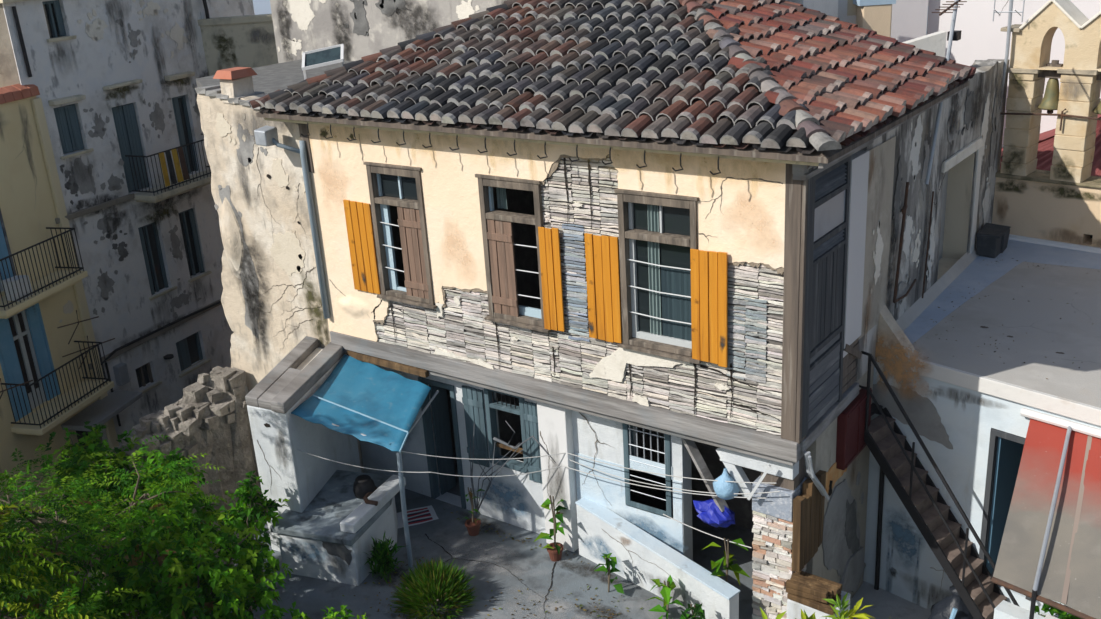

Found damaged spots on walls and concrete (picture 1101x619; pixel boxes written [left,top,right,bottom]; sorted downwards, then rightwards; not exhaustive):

flaking render [277,0,412,56]
damp [106,86,137,98]
damp [145,191,195,224]
crack [699,177,783,243]
flaking render [870,115,935,308]
damp [998,180,1024,193]
damp [1049,187,1101,200]
peeling [872,380,953,449]
crack [579,412,689,594]